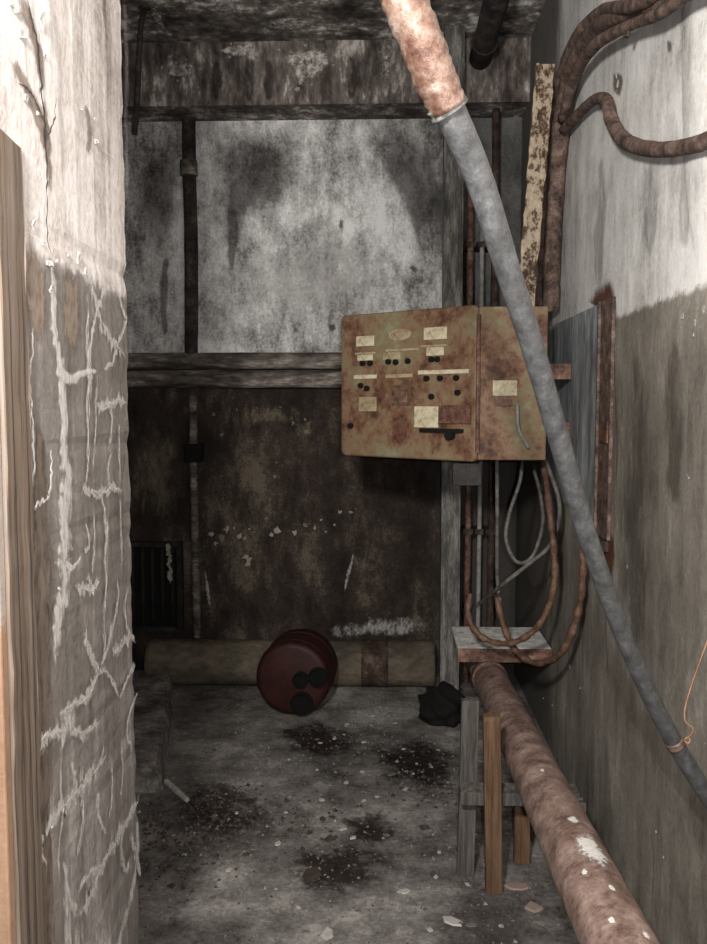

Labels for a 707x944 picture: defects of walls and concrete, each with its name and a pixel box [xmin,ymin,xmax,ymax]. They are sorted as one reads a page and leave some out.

crack [19,1,56,249]
water stain [225,144,283,216]
crack [40,275,141,917]